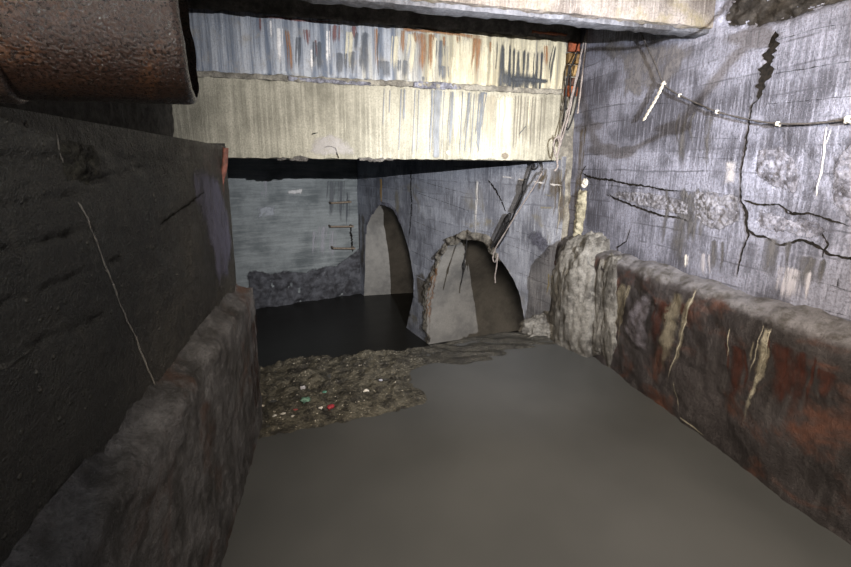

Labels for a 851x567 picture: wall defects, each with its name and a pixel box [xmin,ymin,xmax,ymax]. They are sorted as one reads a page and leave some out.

damp [270,20,283,59]
damp [311,31,367,72]
damp [377,34,415,75]
spalling [726,0,844,27]
damp [398,89,419,152]
damp [429,37,556,157]
crack [580,166,689,222]
spalling [609,191,740,230]
crack [688,25,851,275]
spalling [757,146,801,193]
spalling [833,145,851,218]
spalling [422,230,500,344]